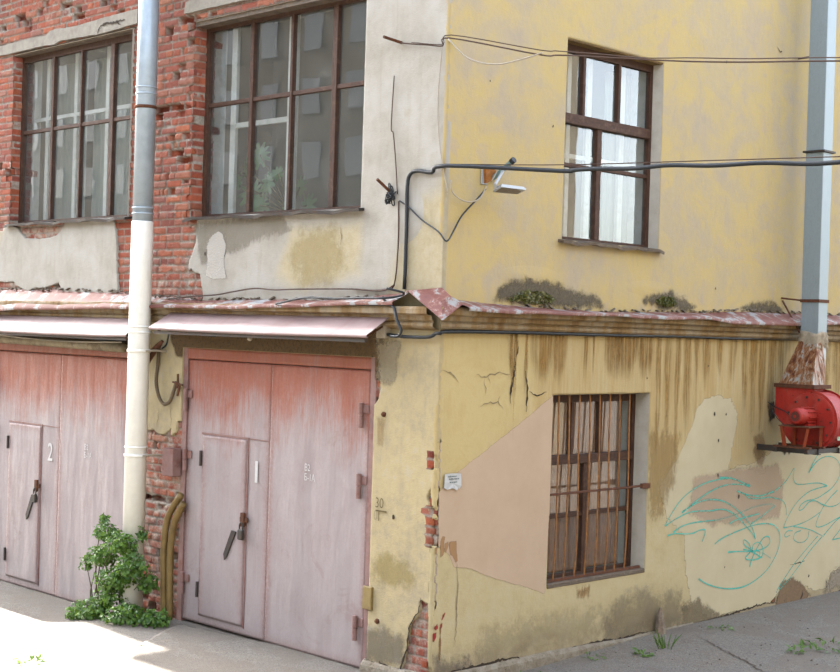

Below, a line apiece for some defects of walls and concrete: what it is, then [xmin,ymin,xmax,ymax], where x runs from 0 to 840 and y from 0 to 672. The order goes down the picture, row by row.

flaking render [0,0,139,239]
flaking render [114,24,138,292]
flaking render [152,0,291,300]
crack [477,347,545,411]
water stain [510,334,564,376]
water stain [607,337,709,433]
water stain [736,340,784,409]
flaking render [403,440,442,672]